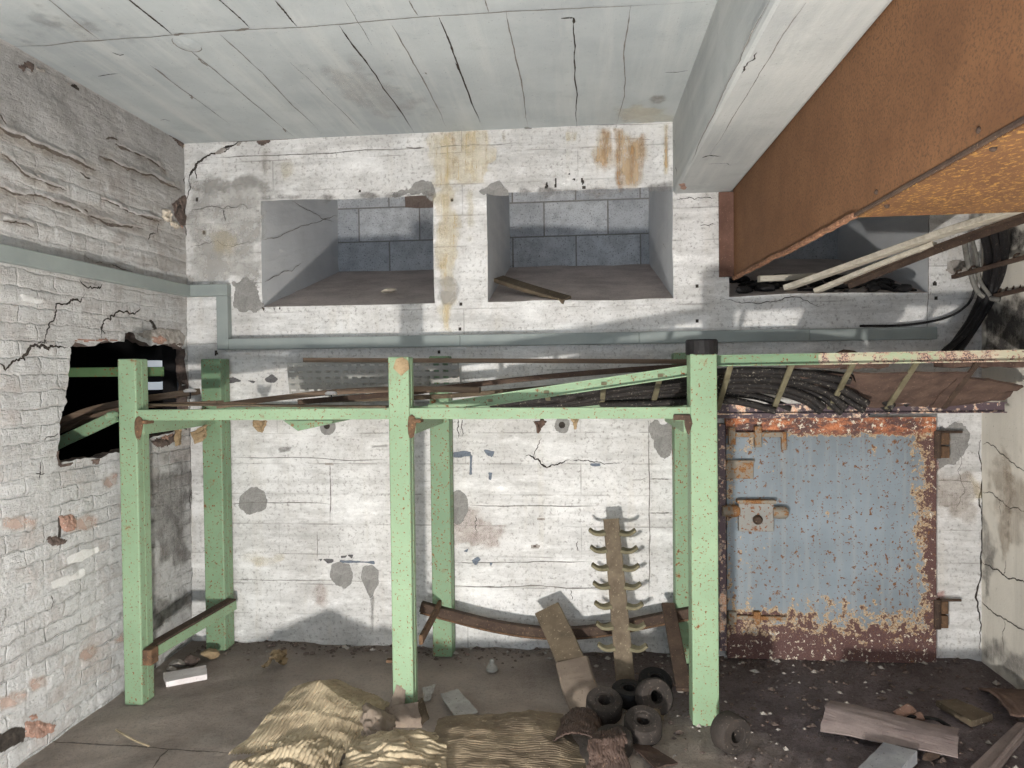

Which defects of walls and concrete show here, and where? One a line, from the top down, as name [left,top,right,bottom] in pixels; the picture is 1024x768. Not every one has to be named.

crack [129,0,170,33]
crack [340,27,414,132]
crack [439,18,480,121]
crack [561,17,578,122]
crack [183,141,255,247]
rust [596,132,642,185]
crack [0,281,102,371]
crack [100,307,140,338]
spalling [151,434,175,448]
crack [526,438,622,468]
spalling [47,510,93,546]
crack [956,440,1024,652]